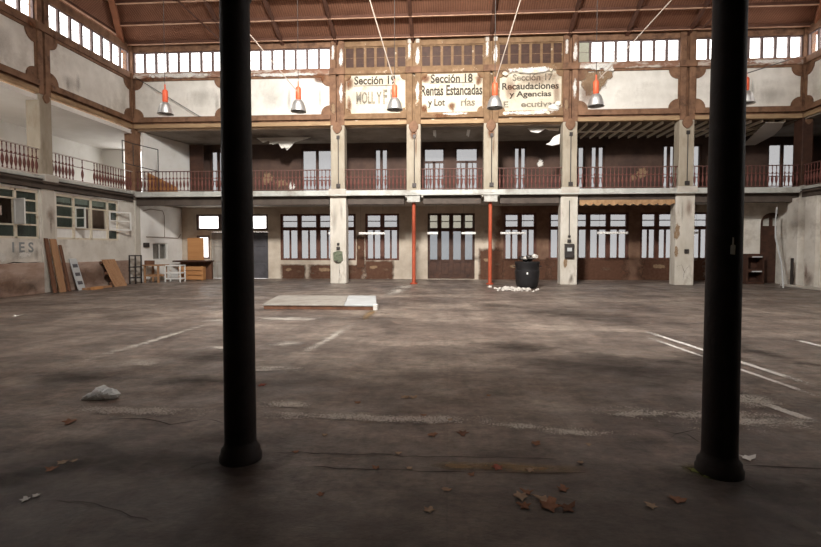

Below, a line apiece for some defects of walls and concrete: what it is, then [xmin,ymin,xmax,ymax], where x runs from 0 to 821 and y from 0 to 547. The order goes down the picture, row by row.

peeling [502,62,614,115]
flaking render [257,137,310,150]